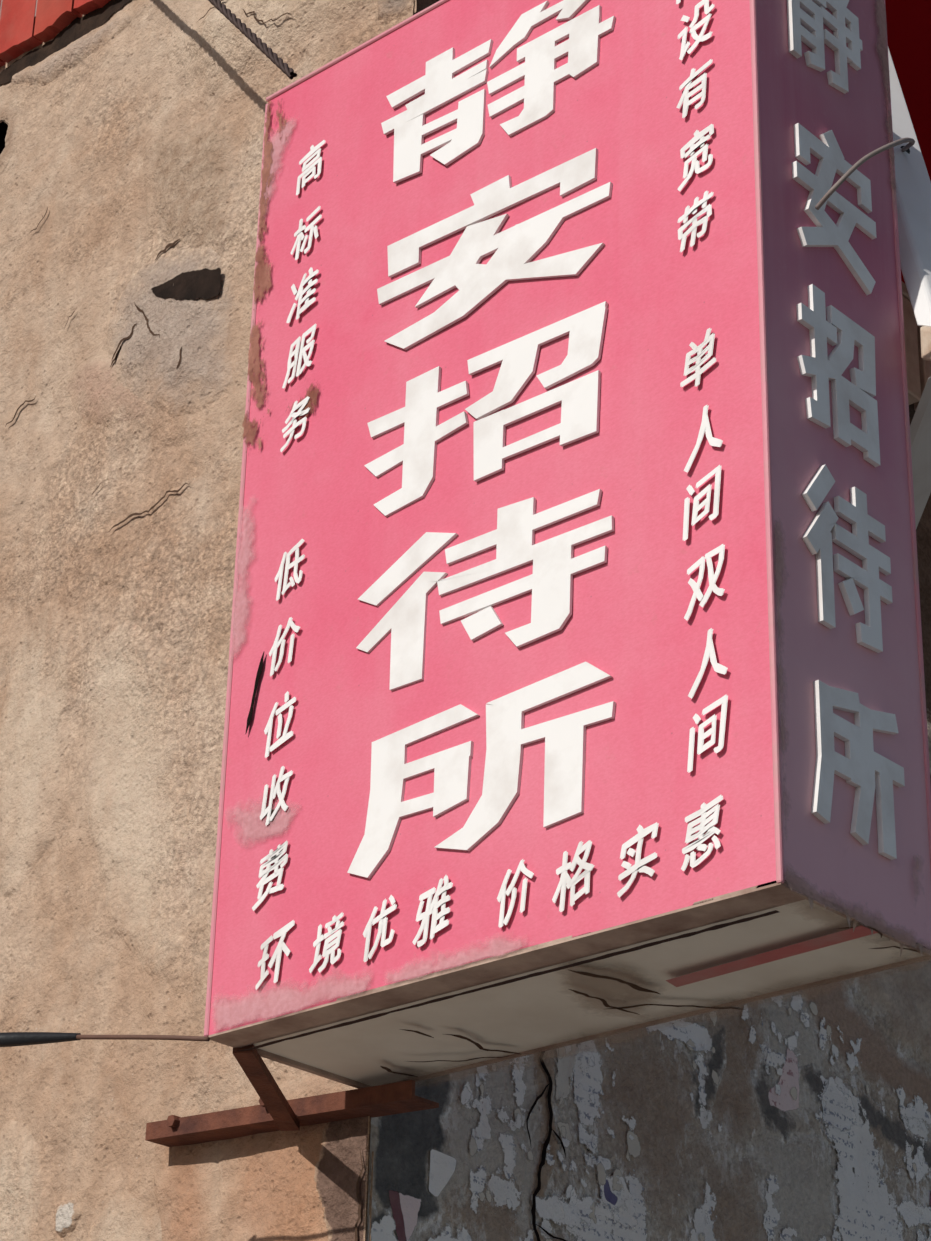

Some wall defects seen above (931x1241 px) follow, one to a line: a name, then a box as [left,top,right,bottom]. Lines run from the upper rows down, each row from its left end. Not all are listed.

spalling [0,0,132,86]
spalling [0,104,18,175]
spalling [68,111,240,427]
crack [5,396,36,427]
crack [108,483,190,532]
corrosion [216,1089,260,1112]
corrosion [154,1123,328,1241]
corrosion [276,1075,355,1100]
peeling [440,1174,532,1241]
crack [526,1049,567,1241]
peeling [589,999,772,1241]
peeling [797,980,931,1126]